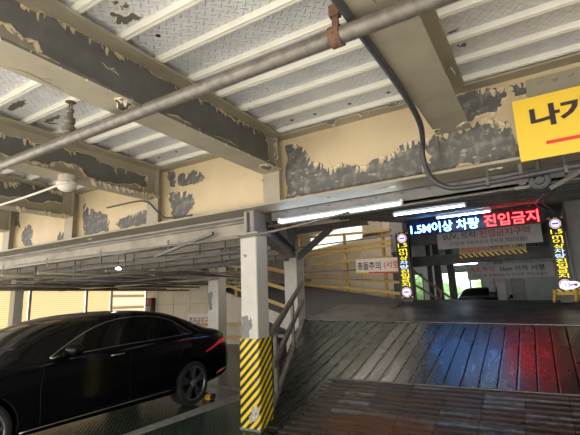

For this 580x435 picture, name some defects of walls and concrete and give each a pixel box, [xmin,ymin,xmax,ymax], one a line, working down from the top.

peeling [0,0,180,112]
peeling [0,132,43,158]
peeling [0,179,65,250]
peeling [26,148,154,200]
peeling [82,197,147,240]
peeling [167,169,207,219]
peeling [158,98,280,171]
peeling [284,82,527,199]